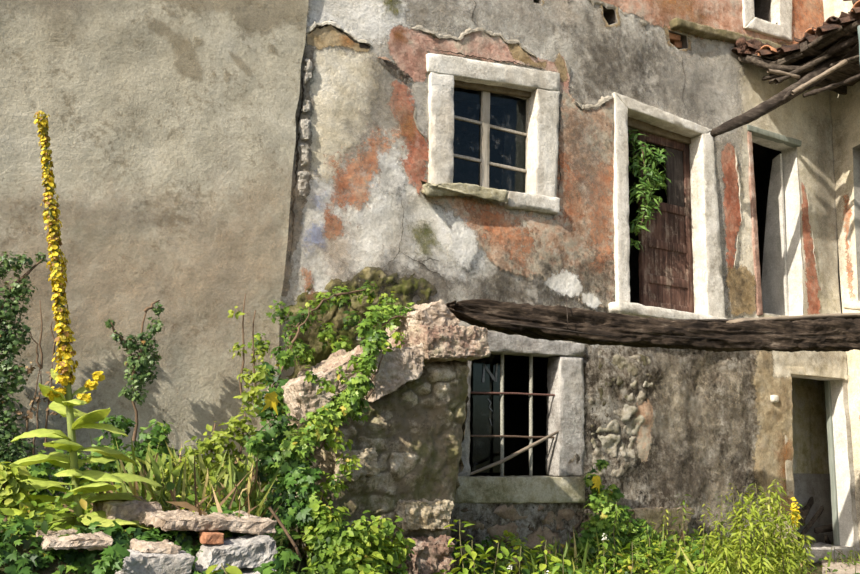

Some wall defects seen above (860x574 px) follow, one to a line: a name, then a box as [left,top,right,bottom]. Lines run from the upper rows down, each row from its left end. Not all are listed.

spalling [306,20,372,52]
peeling [377,25,615,310]
peeling [720,142,743,276]
peeling [801,182,821,315]
peeling [843,192,855,298]
spalling [450,342,771,571]
water stain [653,354,748,529]